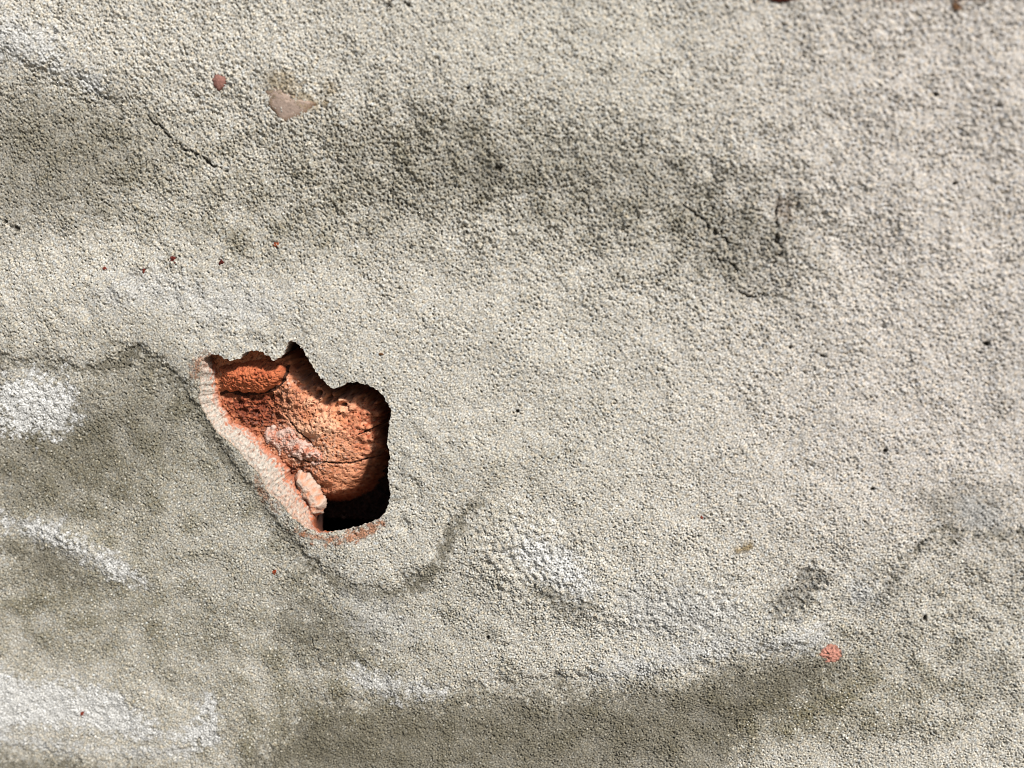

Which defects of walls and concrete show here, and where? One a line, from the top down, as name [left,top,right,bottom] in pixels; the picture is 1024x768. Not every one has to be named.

spalling [198,341,392,534]